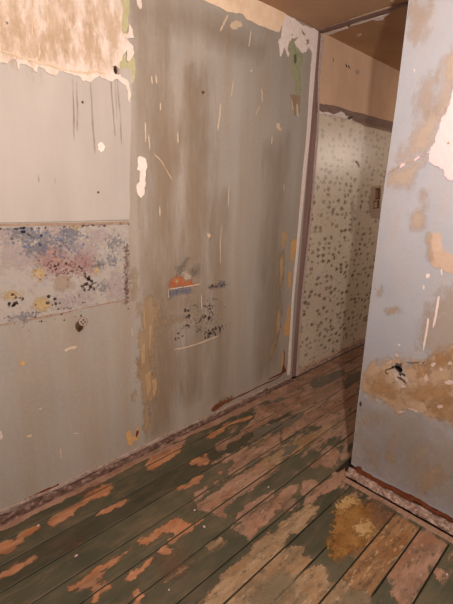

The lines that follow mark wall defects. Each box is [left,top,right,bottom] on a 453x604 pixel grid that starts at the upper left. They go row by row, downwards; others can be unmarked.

peeling [0,0,142,103]
peeling [204,0,395,96]
peeling [136,156,147,198]
spalling [429,90,453,181]
peeling [269,231,297,358]
peeling [428,232,453,275]
peeling [126,274,185,446]